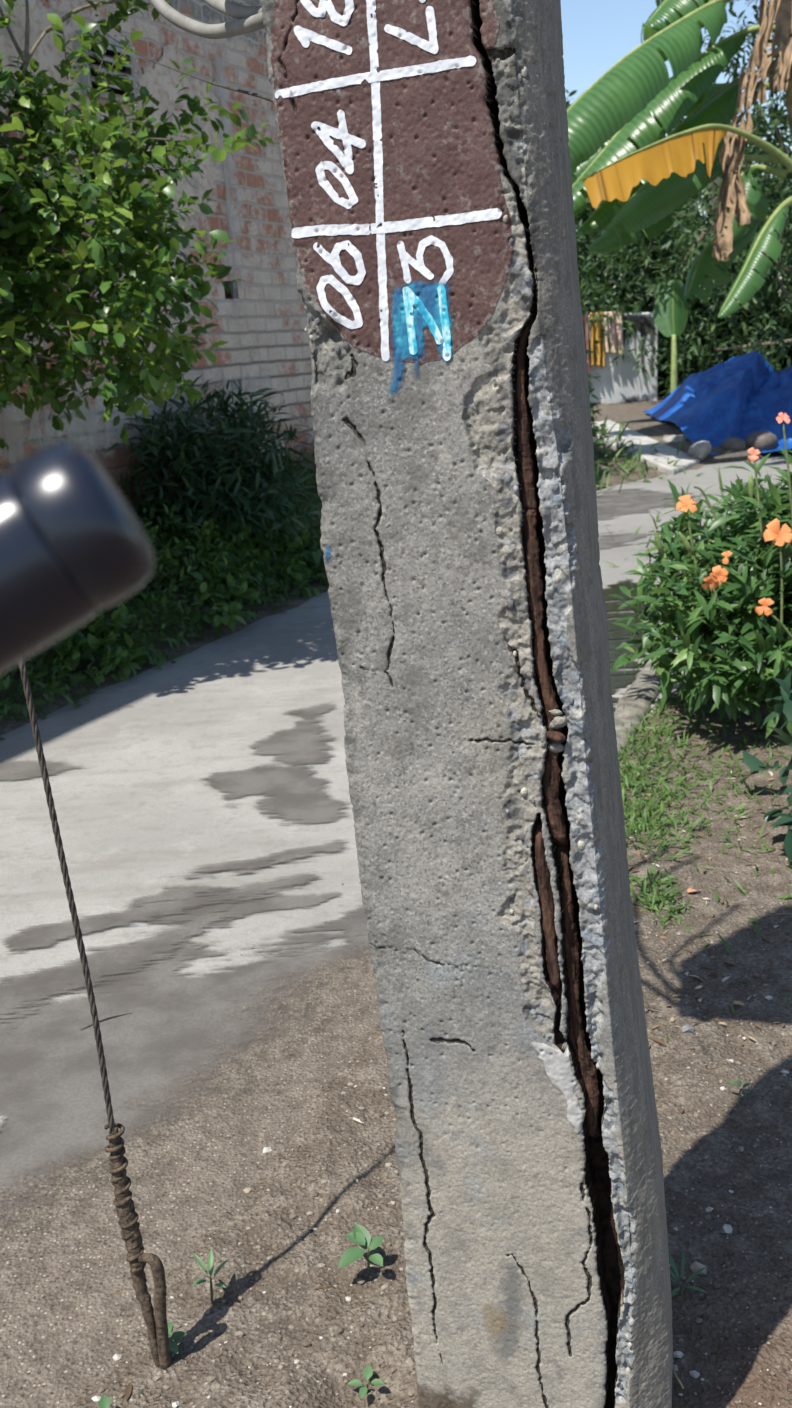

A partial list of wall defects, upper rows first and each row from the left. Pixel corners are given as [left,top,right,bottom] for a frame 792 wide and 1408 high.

crack [345,354,358,380]
leakage [0,759,81,781]
leakage [200,703,349,825]
crack [343,418,395,686]
crack [469,0,625,1408]
spalling [462,0,636,1402]
leakage [0,839,370,1227]
crack [402,1030,475,1361]